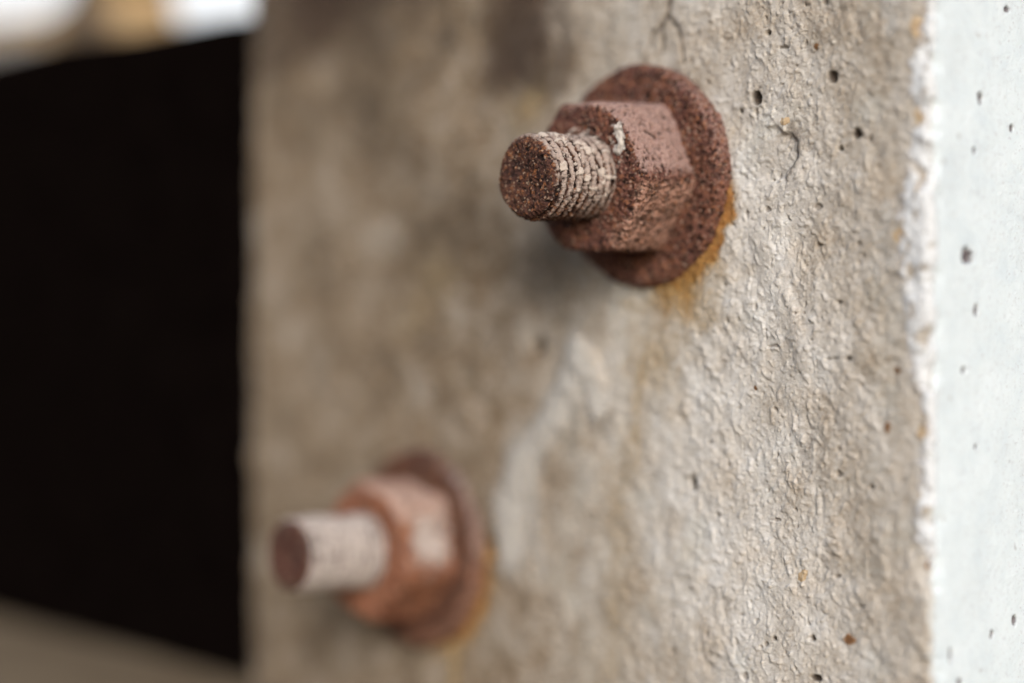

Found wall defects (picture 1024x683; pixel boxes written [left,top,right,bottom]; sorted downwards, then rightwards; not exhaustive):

crack [647,0,685,62]
corrosion [659,182,737,319]